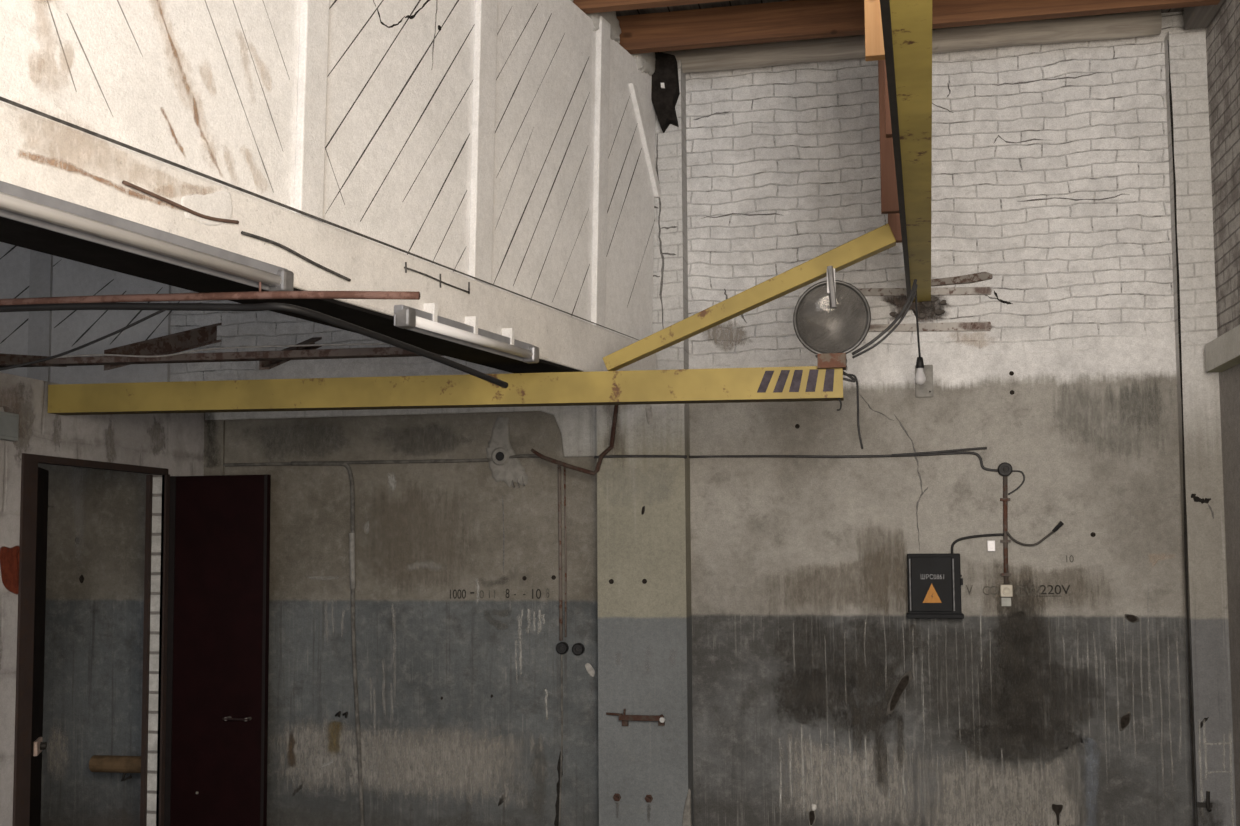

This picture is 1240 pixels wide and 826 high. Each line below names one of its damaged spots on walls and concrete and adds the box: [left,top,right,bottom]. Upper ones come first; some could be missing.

spalling [857,272,993,332]